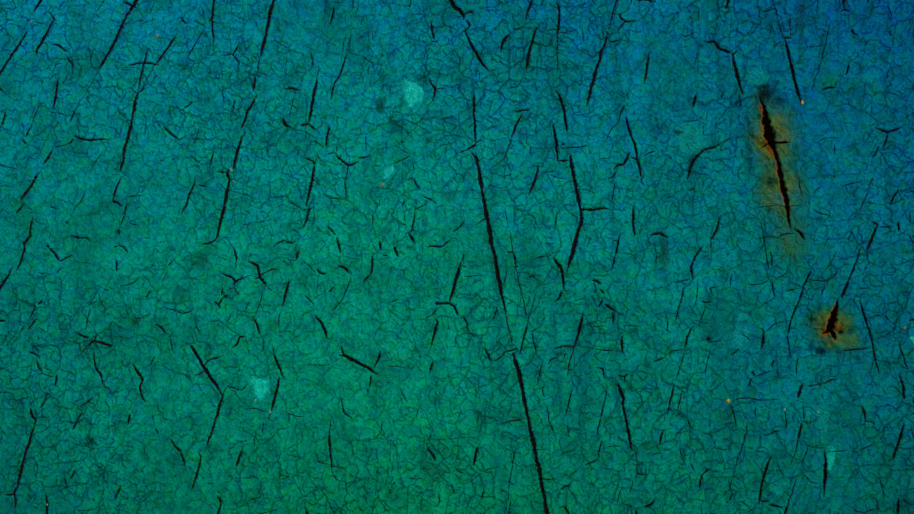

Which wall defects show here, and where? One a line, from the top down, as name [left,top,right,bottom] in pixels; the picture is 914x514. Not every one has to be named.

crack [0,0,398,514]
crack [271,0,914,514]
corrosion [751,107,798,219]
corrosion [814,304,856,347]